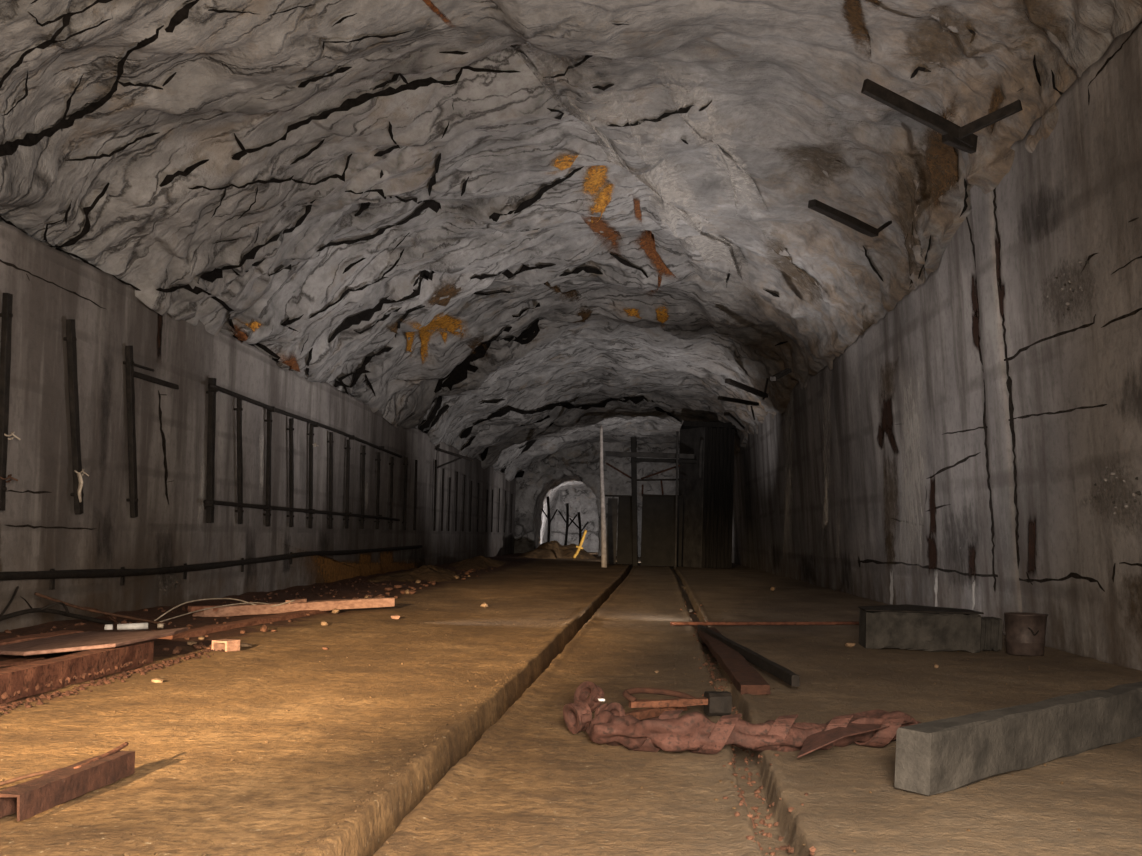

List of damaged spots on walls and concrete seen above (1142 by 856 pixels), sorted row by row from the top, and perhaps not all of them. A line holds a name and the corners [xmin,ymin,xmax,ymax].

corrosion [423,0,451,24]
corrosion [554,155,578,172]
corrosion [583,165,620,251]
crack [0,259,105,309]
corrosion [633,199,675,295]
crack [966,188,1001,286]
crack [1081,253,1142,274]
corrosion [233,320,262,343]
corrosion [387,314,487,363]
crack [858,308,1142,592]
crack [8,488,52,496]
crack [6,523,97,531]